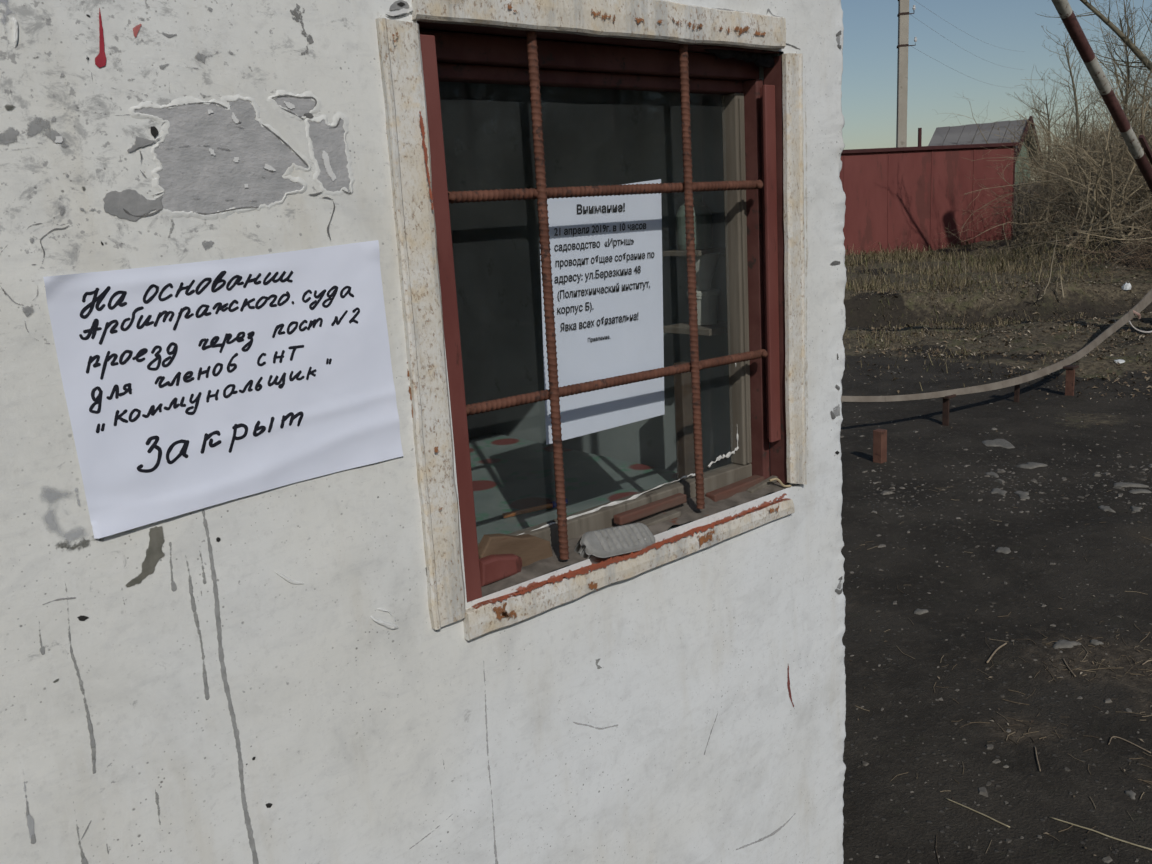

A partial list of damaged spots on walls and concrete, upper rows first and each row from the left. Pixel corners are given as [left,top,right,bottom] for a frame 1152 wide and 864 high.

rust [720,26,766,36]
spalling [103,90,355,240]
rust [472,493,789,620]
water stain [126,510,258,864]